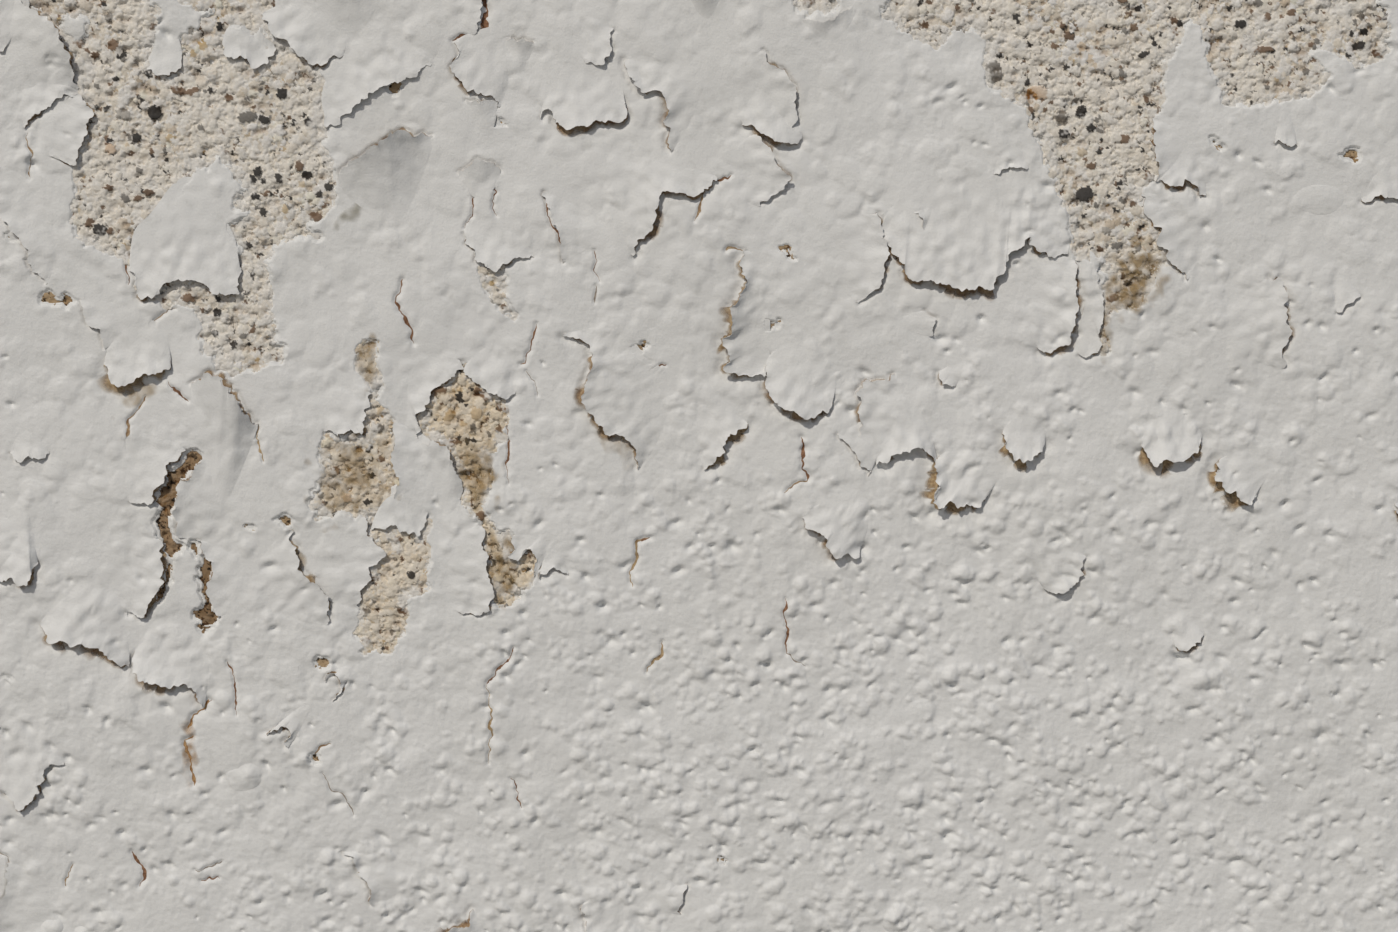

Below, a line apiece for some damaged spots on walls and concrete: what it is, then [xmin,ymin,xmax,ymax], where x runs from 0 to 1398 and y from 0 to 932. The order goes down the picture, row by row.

peeling [540,16,802,256]
peeling [835,0,1392,368]
peeling [0,0,568,708]
crack [395,279,414,343]
peeling [718,246,837,421]
crack [784,437,809,493]
peeling [802,374,997,560]
peeling [1139,408,1266,509]
crack [629,537,650,587]
crack [783,598,805,666]
crack [486,649,522,808]
crack [132,852,147,884]